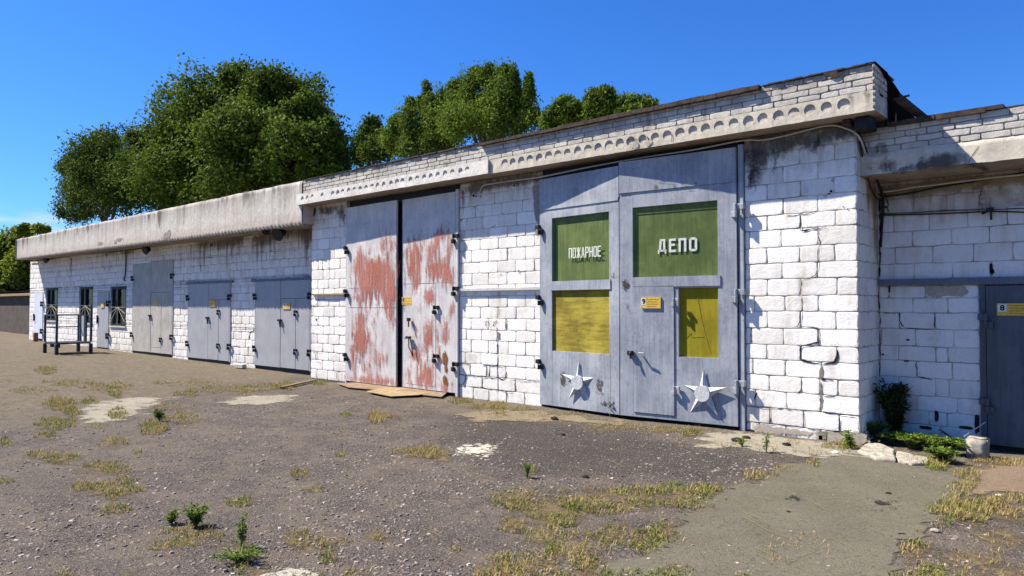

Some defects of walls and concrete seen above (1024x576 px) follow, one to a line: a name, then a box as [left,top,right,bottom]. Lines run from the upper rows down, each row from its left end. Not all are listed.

leakage [744,123,854,180]
leakage [880,154,1024,205]